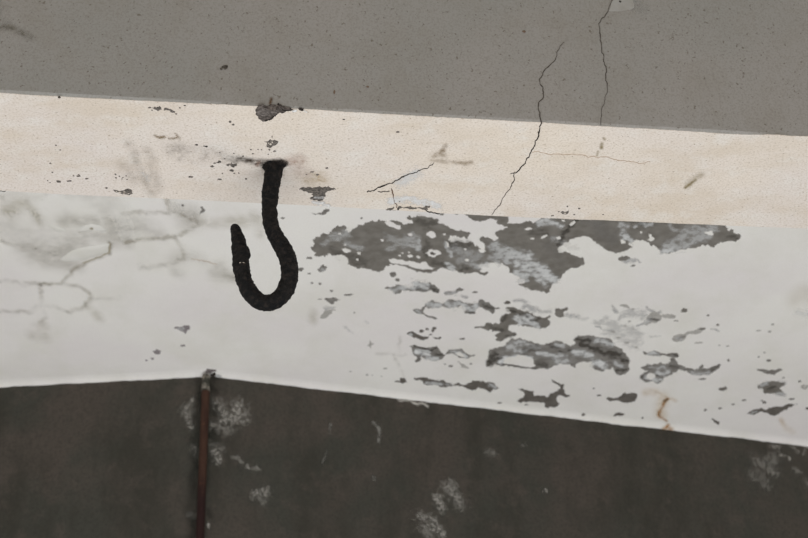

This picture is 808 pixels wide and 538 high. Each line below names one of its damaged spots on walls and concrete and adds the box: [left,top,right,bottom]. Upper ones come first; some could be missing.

crack [598,0,612,124]
spalling [255,98,307,122]
crack [492,42,650,215]
peeling [299,186,336,215]
crack [367,150,444,210]
peeling [298,201,741,384]
water stain [213,398,248,427]
peeling [394,377,498,393]
peeling [518,379,570,408]
peeling [592,388,637,416]
peeling [747,352,808,416]
water stain [417,484,463,538]